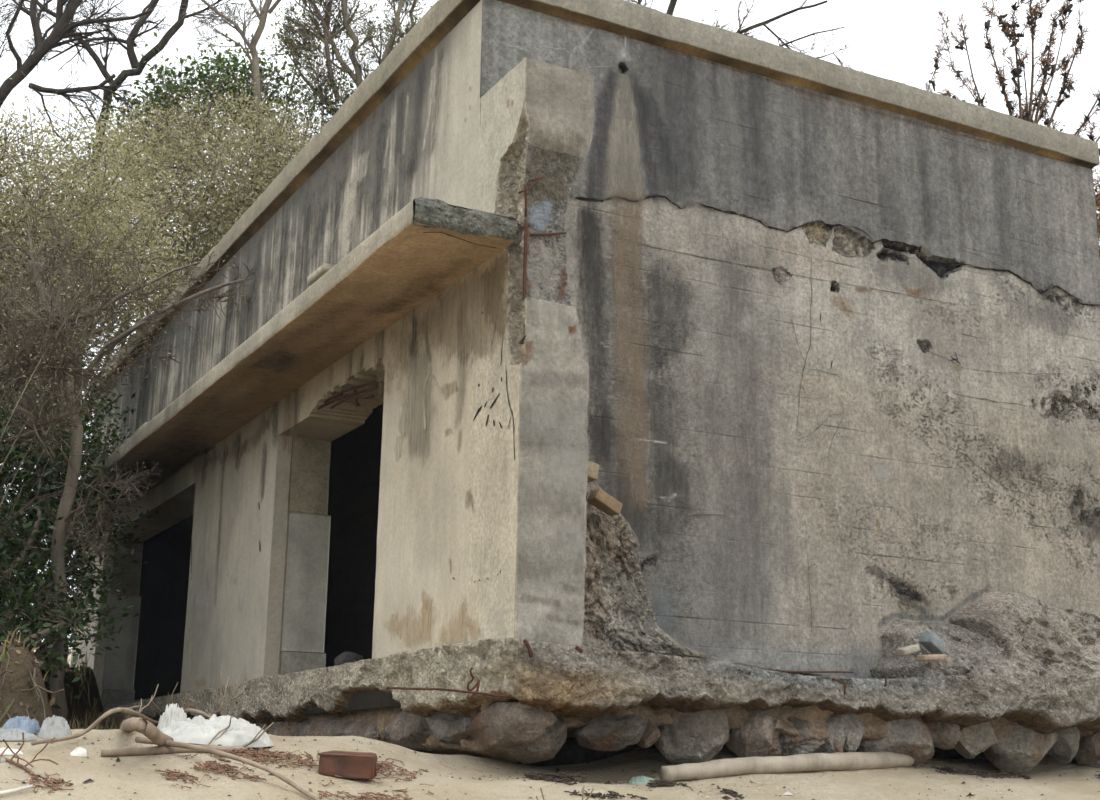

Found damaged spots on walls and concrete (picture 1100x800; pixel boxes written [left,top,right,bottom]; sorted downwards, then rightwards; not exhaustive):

leakage [292,193,343,301]
spalling [523,184,566,300]
crack [575,195,921,253]
crack [955,249,1100,306]
leakage [580,75,688,542]
spalling [317,380,383,410]
spalling [640,554,658,572]
spalling [387,667,507,700]
spalling [780,670,855,694]